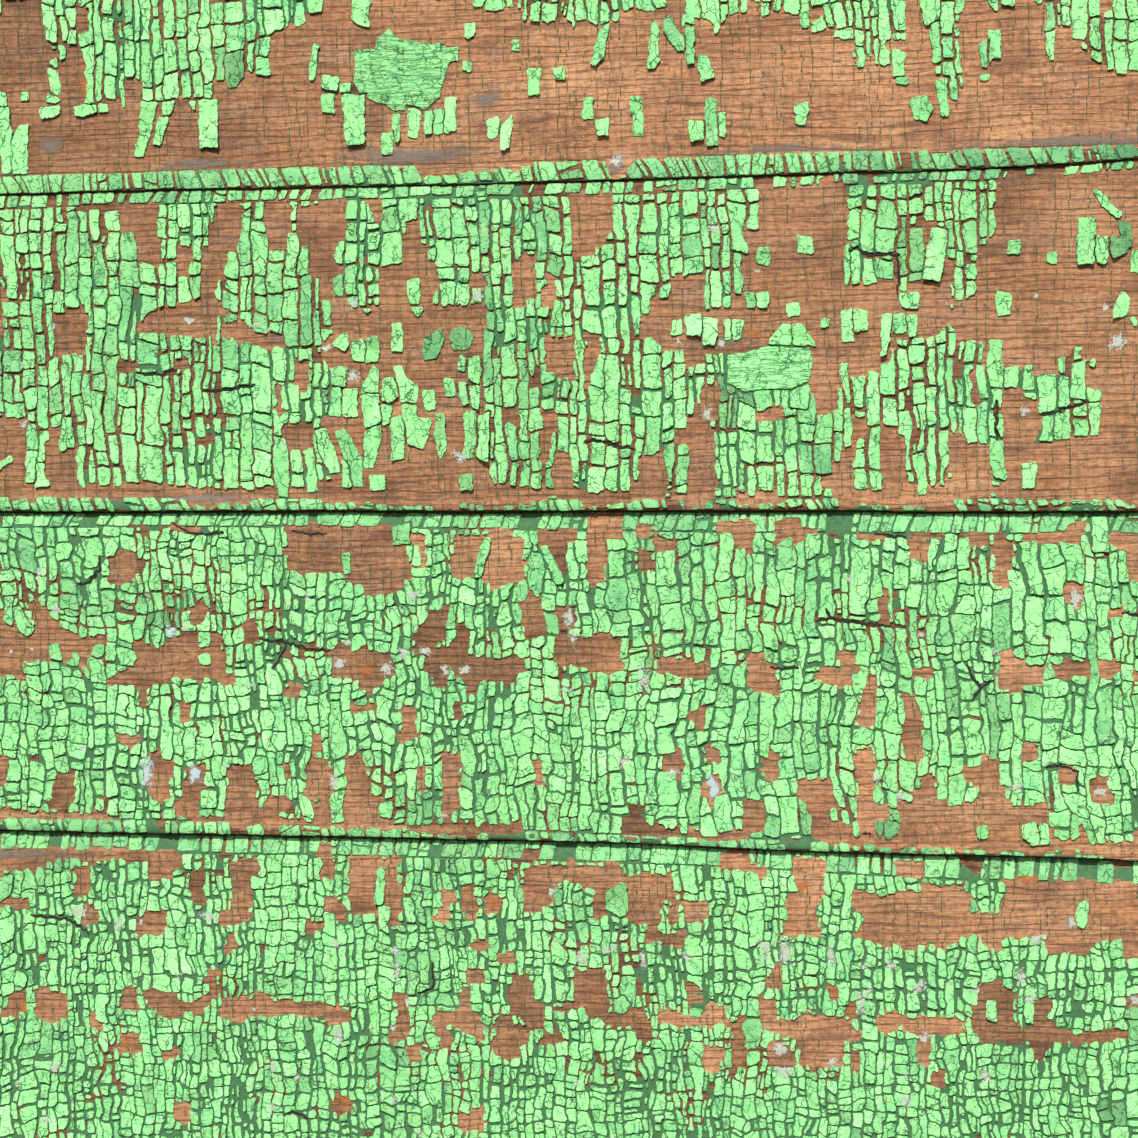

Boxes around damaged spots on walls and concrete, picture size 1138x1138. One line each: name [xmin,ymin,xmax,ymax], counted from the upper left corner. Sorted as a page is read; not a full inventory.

peeling [0,0,1138,260]
crack [849,246,900,296]
crack [205,384,254,392]
peeling [0,163,1138,679]
crack [585,439,634,449]
peeling [0,596,240,711]
crack [260,638,330,668]
peeling [411,605,530,720]
crack [816,609,891,627]
peeling [778,663,1138,964]
crack [32,915,89,934]
peeling [429,884,862,1076]